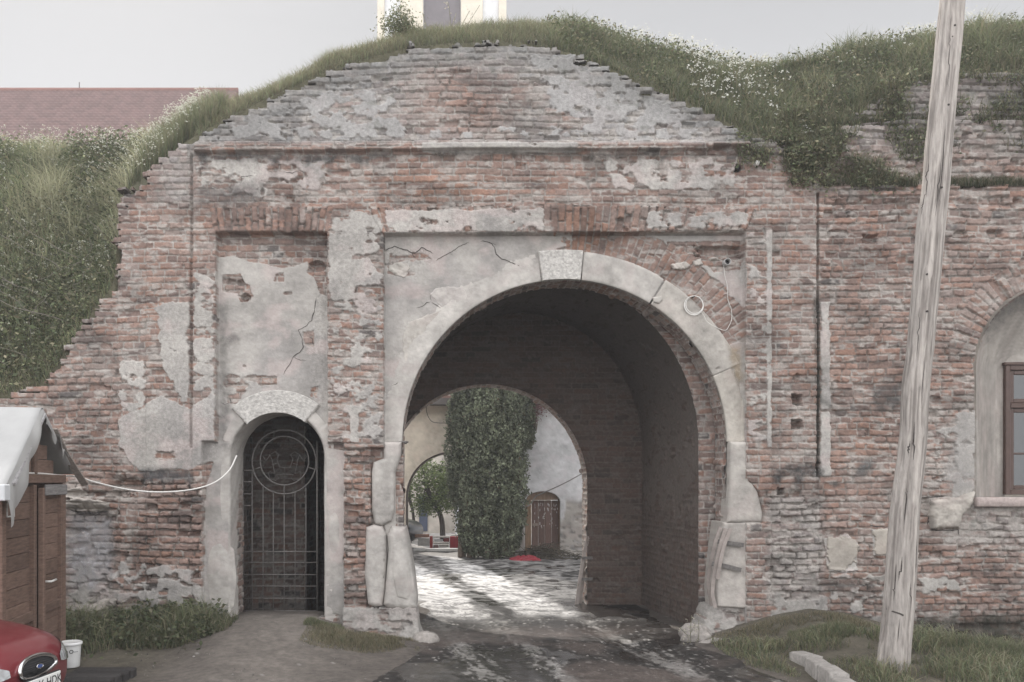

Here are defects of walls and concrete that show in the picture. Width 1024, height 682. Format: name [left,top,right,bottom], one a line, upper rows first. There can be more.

spalling [419,64,526,138]
crack [384,241,519,266]
crack [284,300,316,373]
peeling [220,232,385,412]
spalling [154,451,175,462]
spalling [65,476,206,612]
spalling [766,487,888,603]